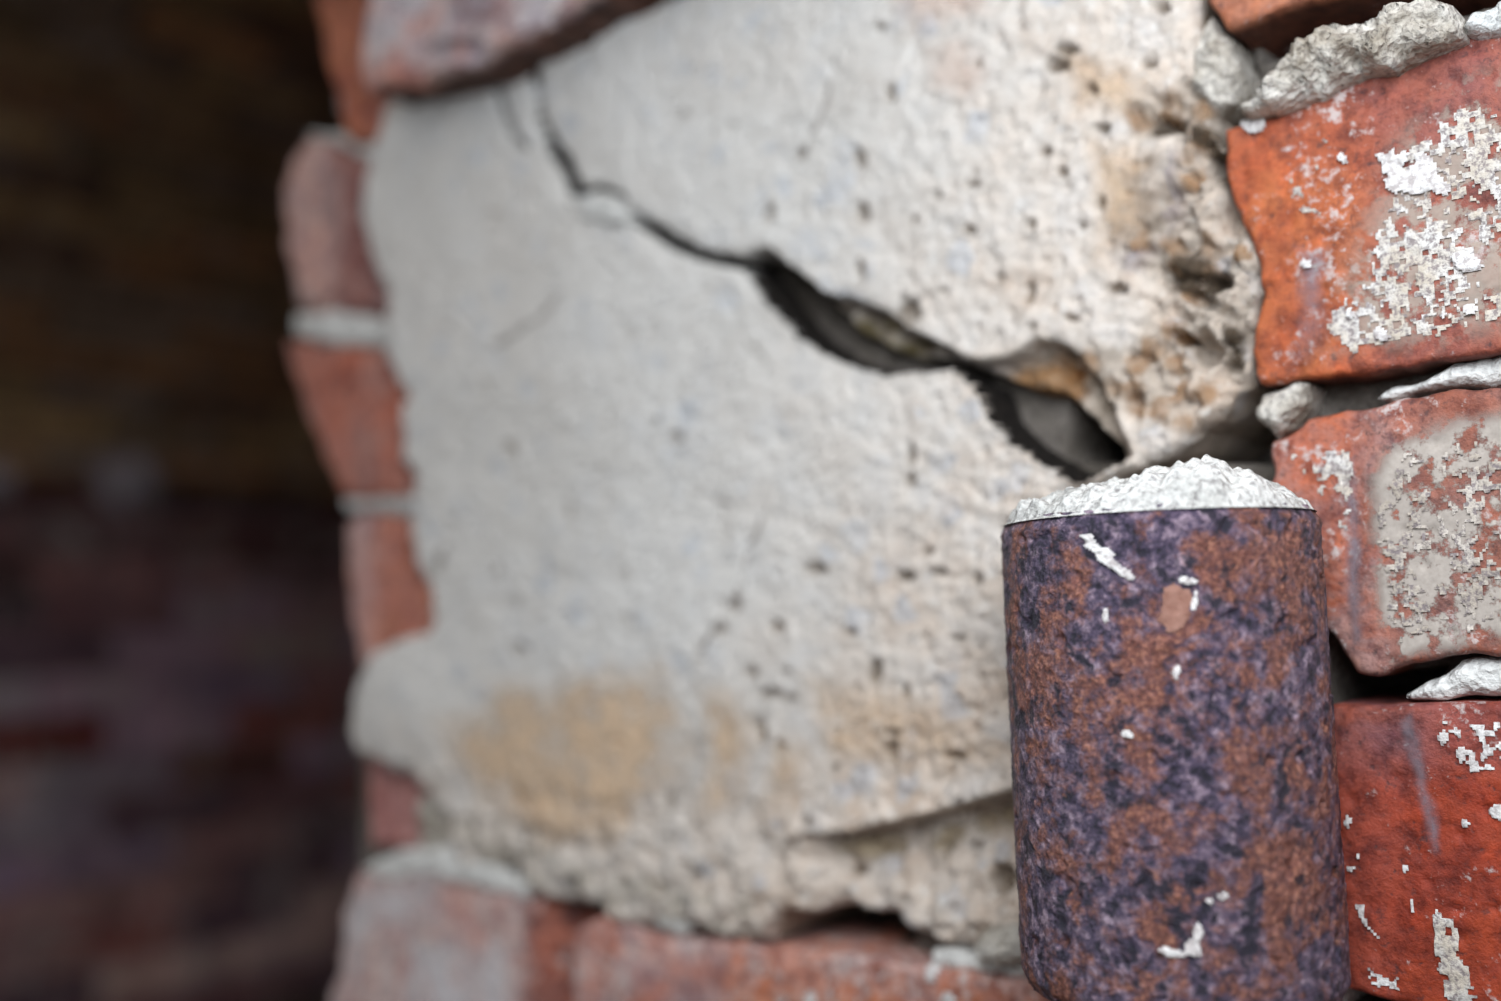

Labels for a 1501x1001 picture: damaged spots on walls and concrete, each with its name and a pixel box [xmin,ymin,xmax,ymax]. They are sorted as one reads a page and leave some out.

crack [494,75,1128,483]
damp [1289,178,1321,215]
damp [1327,107,1501,353]
rust [1157,583,1193,633]
damp [1291,450,1358,600]
damp [1377,441,1501,642]